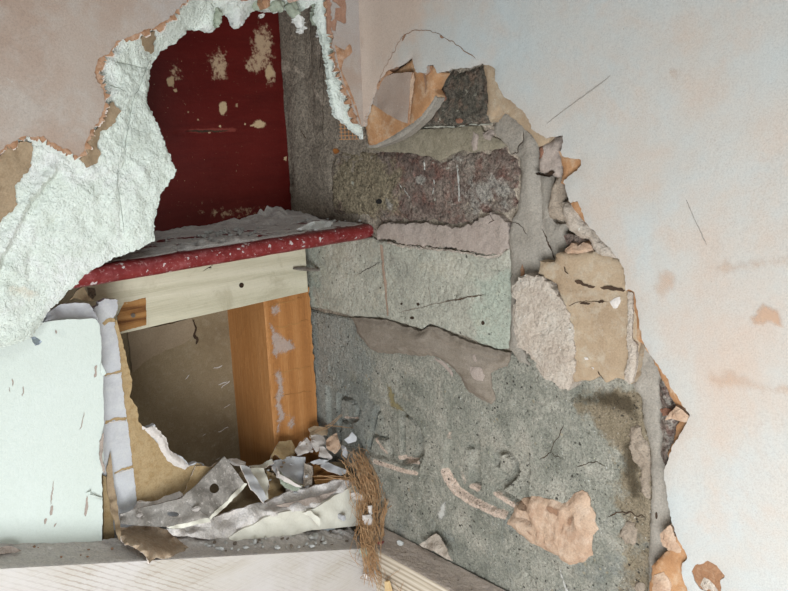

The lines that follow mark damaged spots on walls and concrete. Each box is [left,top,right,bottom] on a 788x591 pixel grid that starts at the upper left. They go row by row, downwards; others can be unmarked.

flaking render [326,0,346,35]
crack [379,30,475,82]
peeling [335,44,450,148]
peeling [484,65,560,147]
peeling [559,151,581,185]
peeling [571,201,585,221]
flaking render [511,251,686,409]
peeling [668,422,687,458]
flaking render [362,505,373,525]
peeling [420,533,453,561]
peeling [649,523,687,591]
flaking render [692,561,725,591]